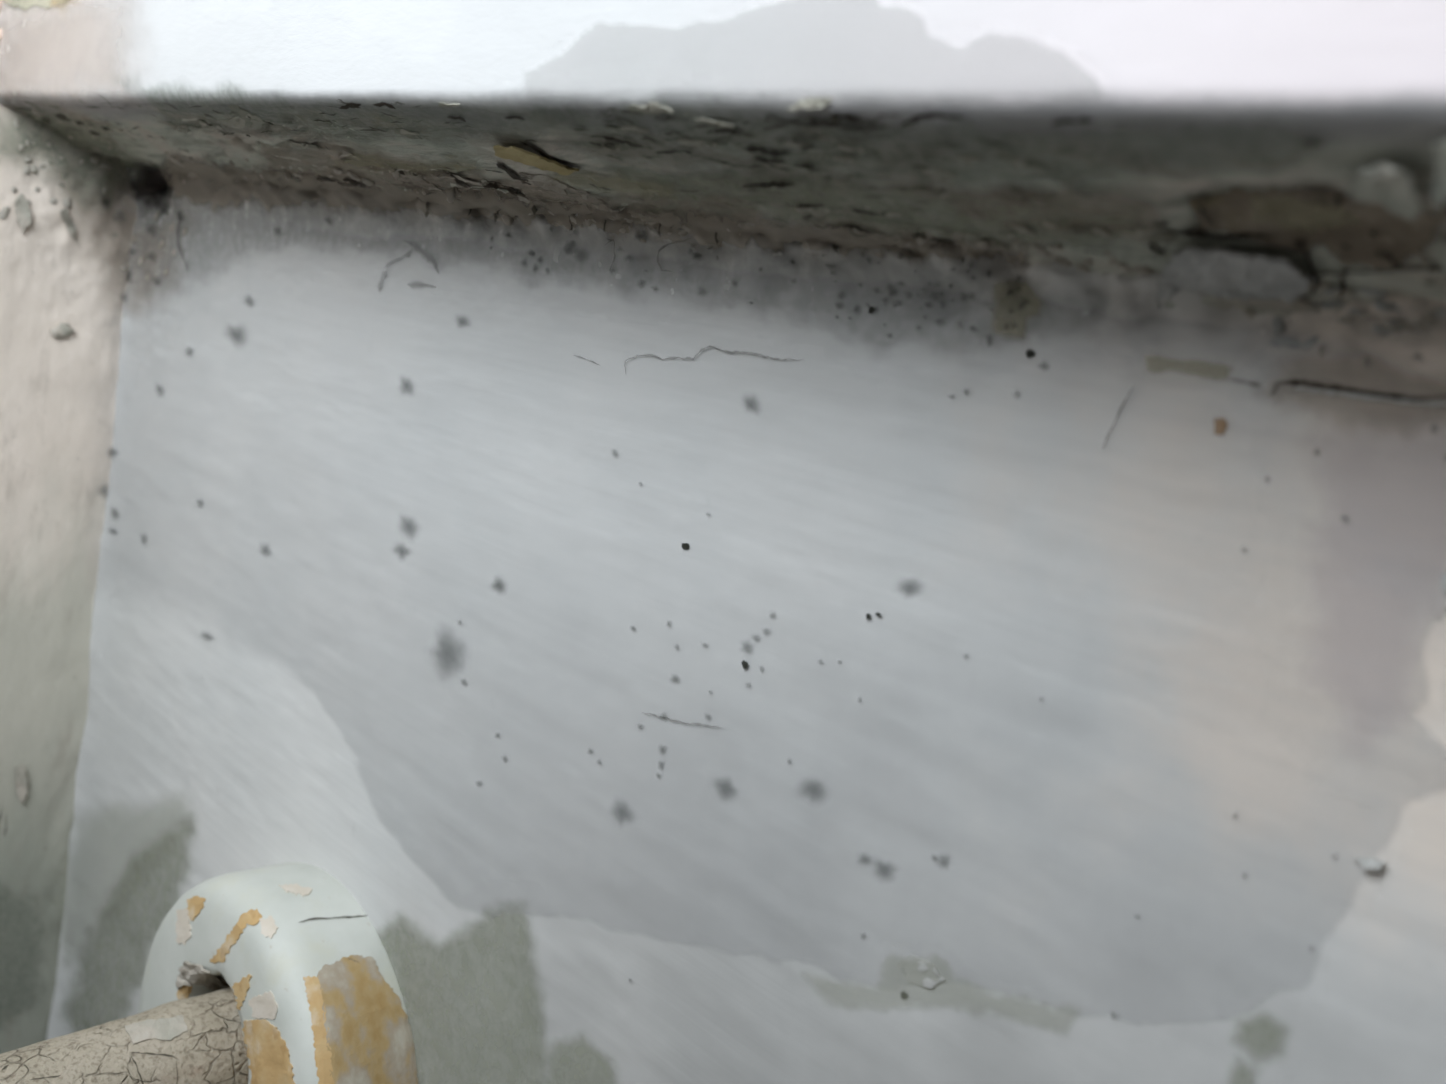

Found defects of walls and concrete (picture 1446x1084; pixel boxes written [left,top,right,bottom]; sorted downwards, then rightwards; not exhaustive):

leakage [2,116,139,203]
flaking render [0,94,1446,304]
leakage [616,167,1139,243]
crack [574,346,795,372]
crack [1232,379,1446,407]
leakage [71,835,184,1031]
peeling [186,896,206,921]
peeling [210,909,278,963]
peeling [228,974,295,1084]
peeling [303,955,418,1084]
leakage [380,908,610,1084]